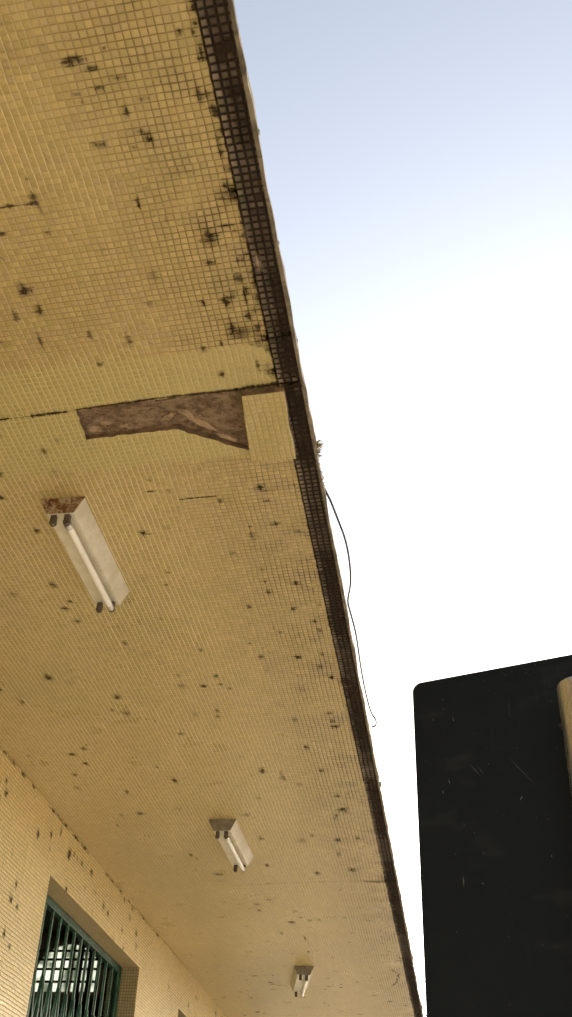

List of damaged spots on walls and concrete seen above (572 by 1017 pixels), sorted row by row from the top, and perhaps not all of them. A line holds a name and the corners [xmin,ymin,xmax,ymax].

crack [0,381,302,421]
spalling [78,389,248,445]
damp [177,0,422,1017]